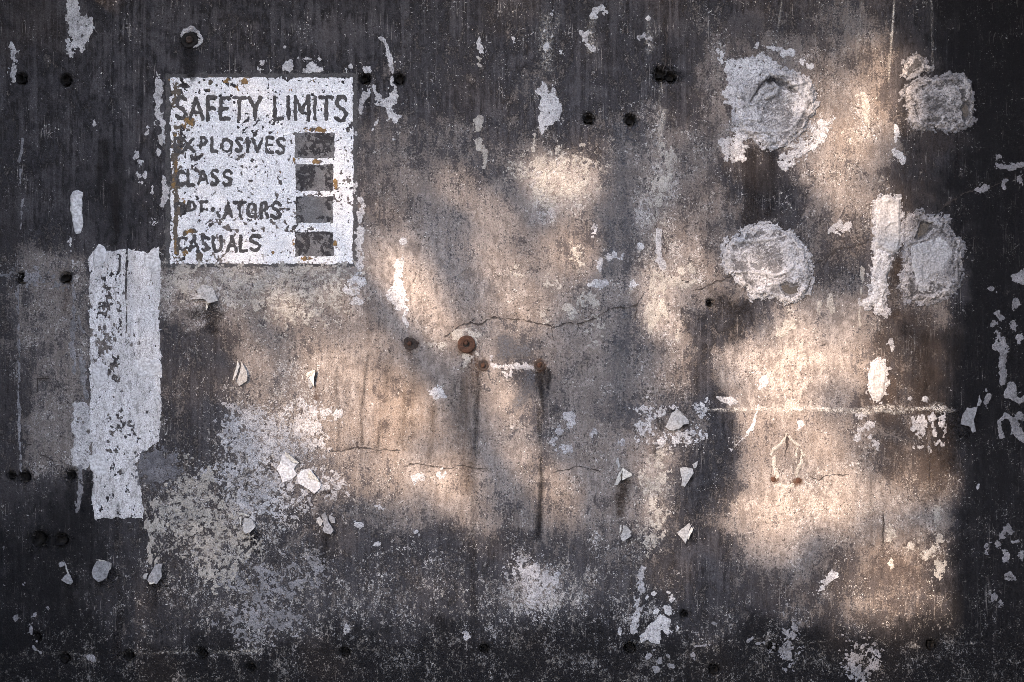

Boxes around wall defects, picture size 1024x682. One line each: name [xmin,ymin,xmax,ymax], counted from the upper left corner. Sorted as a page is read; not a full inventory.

damp [892,258,904,291]
peeling [1011,268,1024,285]
crack [444,293,644,340]
peeling [51,190,350,608]
damp [512,368,551,412]
peeling [961,296,1024,443]
peeling [547,411,576,454]
peeling [411,467,447,486]
damp [535,463,543,539]
peeling [614,394,738,674]
peeling [211,605,276,652]